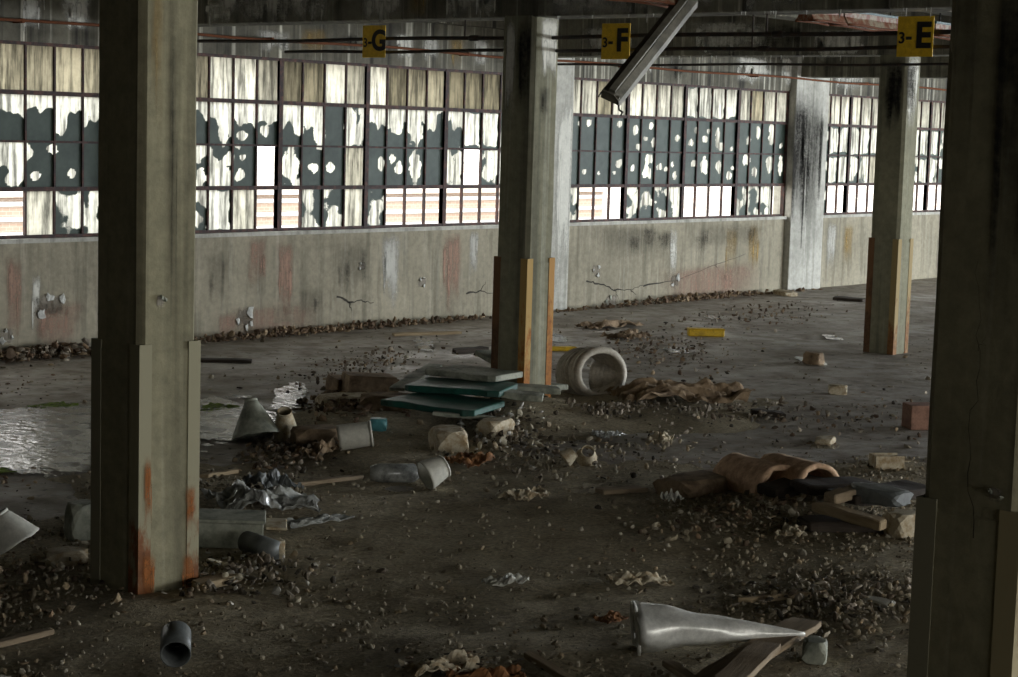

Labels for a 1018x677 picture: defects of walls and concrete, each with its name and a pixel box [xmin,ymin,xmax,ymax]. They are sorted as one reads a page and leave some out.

damp [792,106,823,242]
crack [586,255,742,299]
peeling [37,293,66,319]